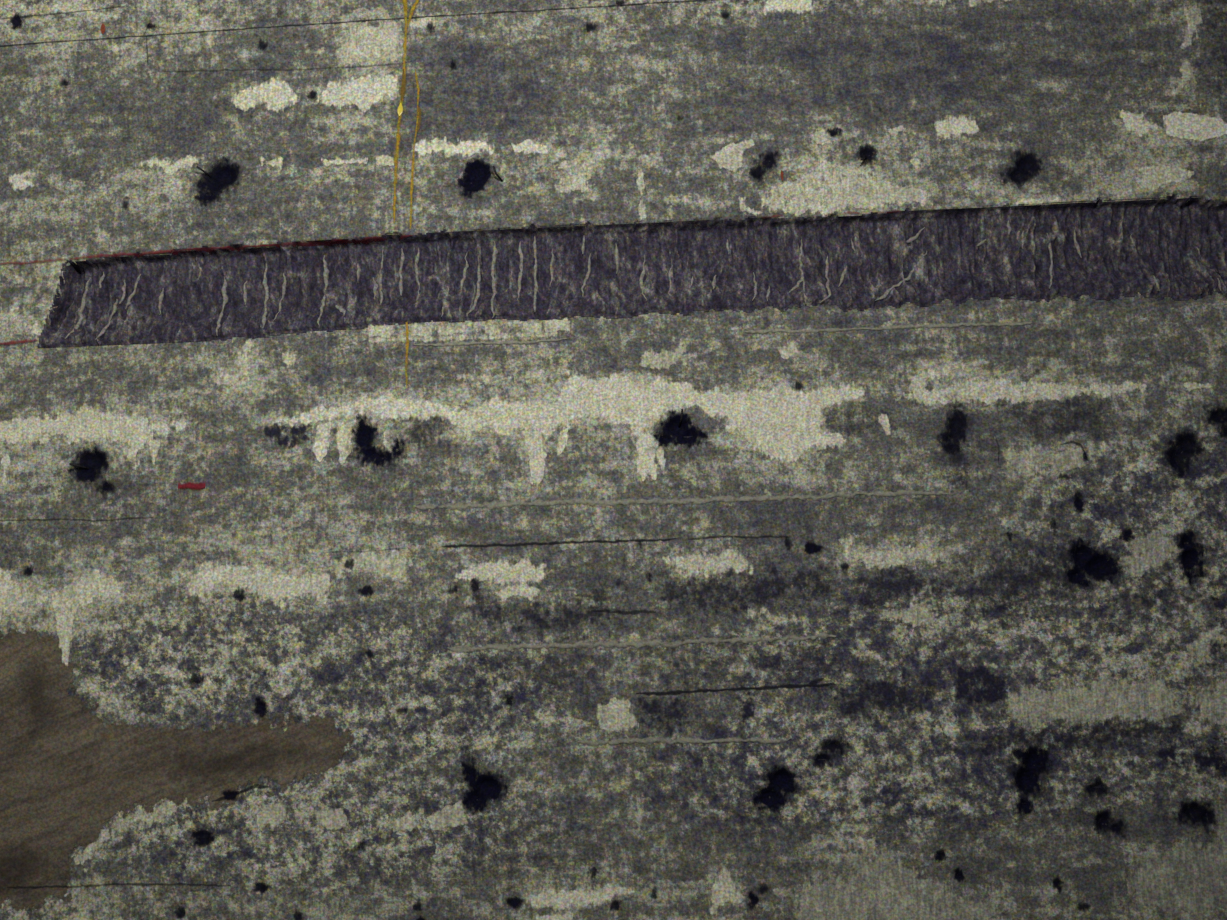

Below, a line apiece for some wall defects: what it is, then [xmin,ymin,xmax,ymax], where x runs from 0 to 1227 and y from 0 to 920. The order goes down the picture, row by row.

corrosion [393,0,421,229]
peeling [1004,196,1060,209]
peeling [368,318,570,344]
damp [264,422,310,447]
crack [441,535,791,548]
crack [639,678,839,695]